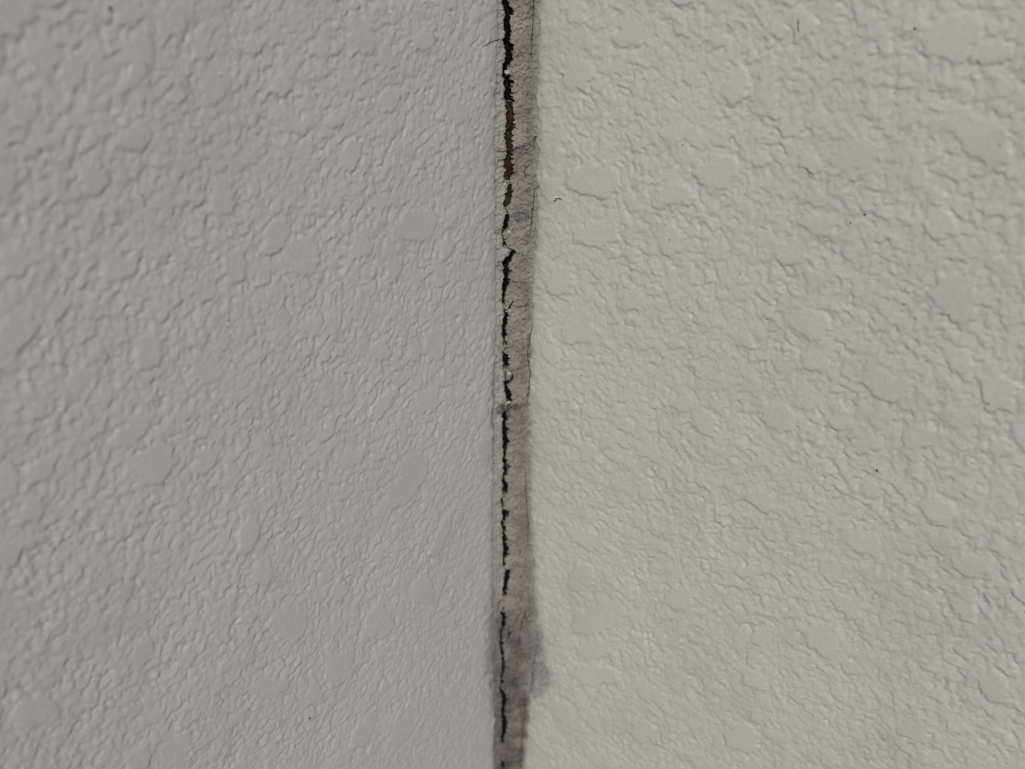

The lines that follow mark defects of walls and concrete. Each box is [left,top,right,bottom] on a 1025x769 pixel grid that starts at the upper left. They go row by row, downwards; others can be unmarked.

crack [484,0,562,769]